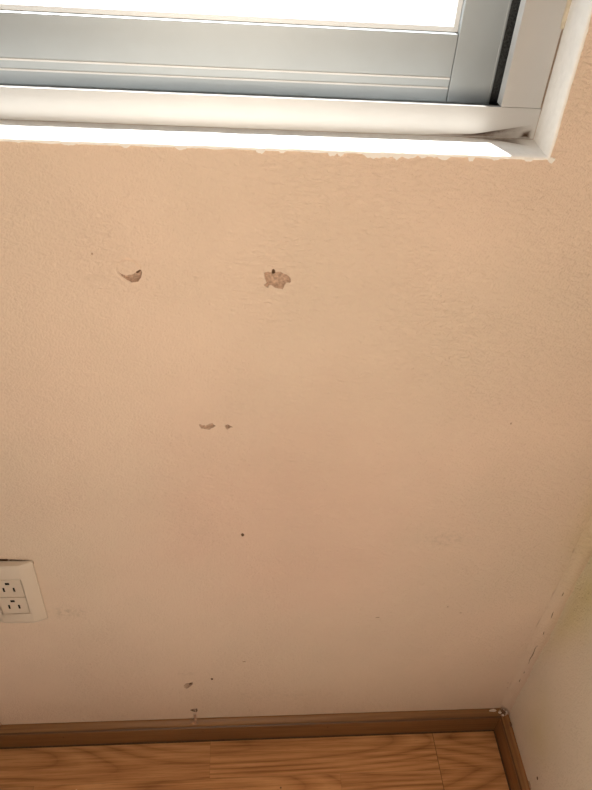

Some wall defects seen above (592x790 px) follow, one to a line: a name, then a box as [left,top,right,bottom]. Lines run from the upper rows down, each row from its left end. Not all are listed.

spalling [114,258,143,283]
flaking render [263,268,292,289]
spalling [199,422,233,430]